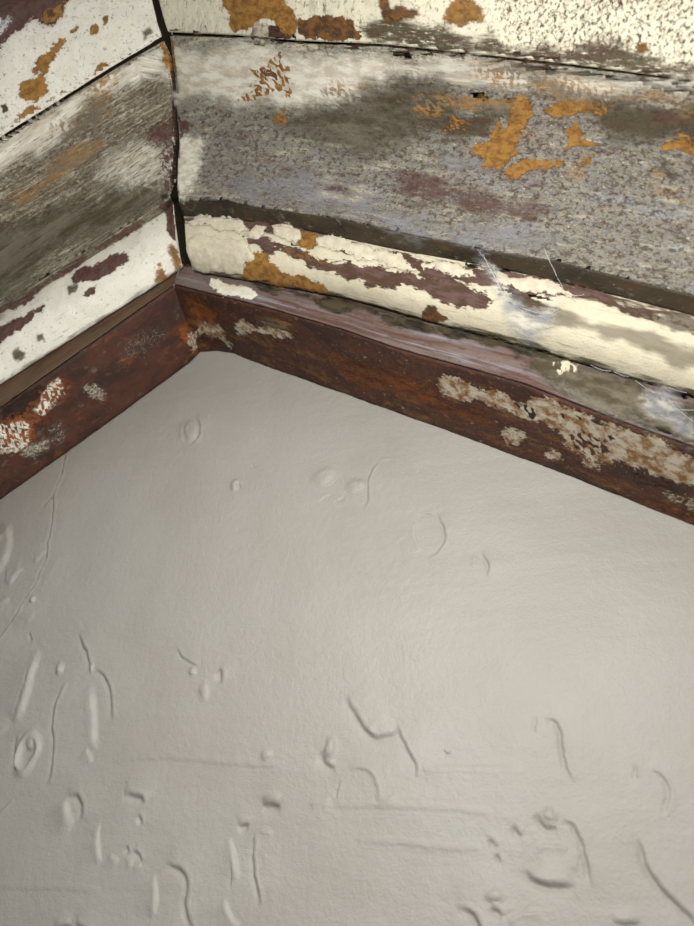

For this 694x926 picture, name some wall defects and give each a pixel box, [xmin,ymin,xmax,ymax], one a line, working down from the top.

peeling [0,0,69,49]
rust [379,0,418,24]
rust [442,0,484,27]
peeling [0,26,110,131]
rust [480,61,616,103]
peeling [0,220,146,343]
peeling [154,199,694,335]
rust [178,298,233,352]
peeling [12,348,25,360]
peeling [553,360,578,375]
rust [0,377,71,454]
peeling [436,374,694,512]